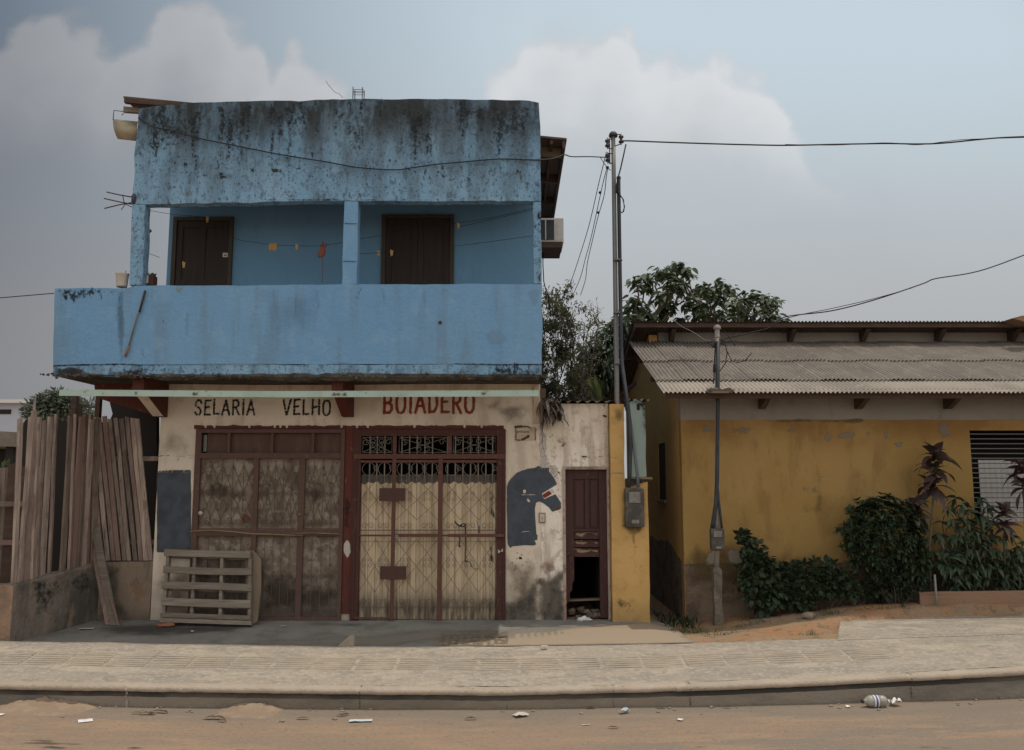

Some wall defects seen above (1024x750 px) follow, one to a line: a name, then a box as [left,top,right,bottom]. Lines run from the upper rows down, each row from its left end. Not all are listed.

damp [144,106,204,176]
damp [217,105,252,179]
damp [270,103,321,179]
damp [457,101,528,154]
spalling [40,372,548,382]
damp [505,565,563,620]